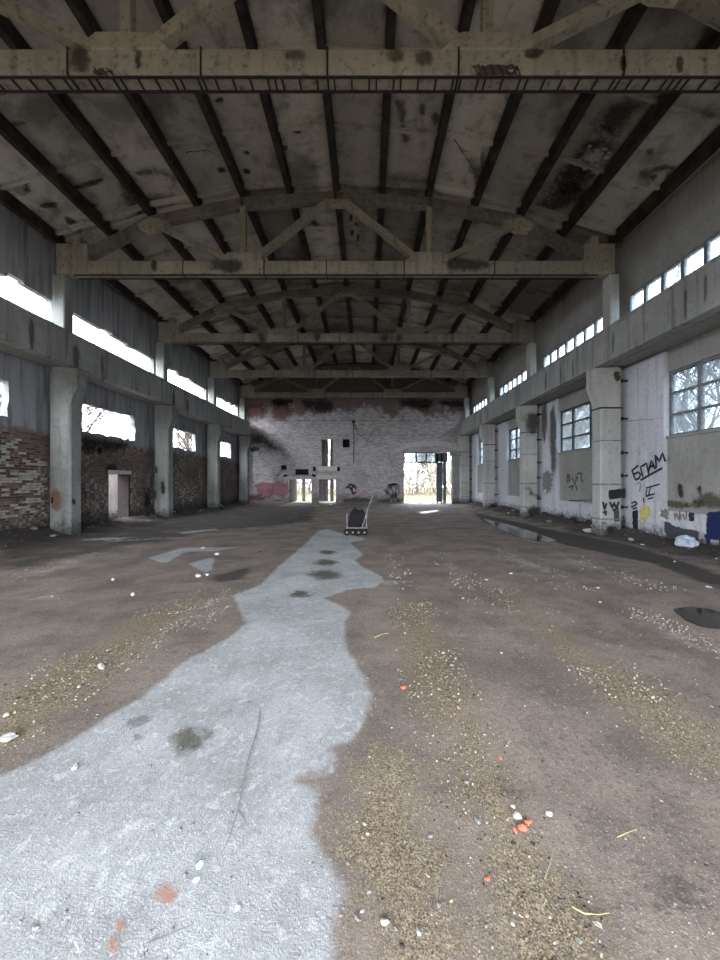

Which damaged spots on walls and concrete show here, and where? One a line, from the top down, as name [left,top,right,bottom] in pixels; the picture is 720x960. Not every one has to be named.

spalling [470,61,522,76]
damp [526,404,556,471]